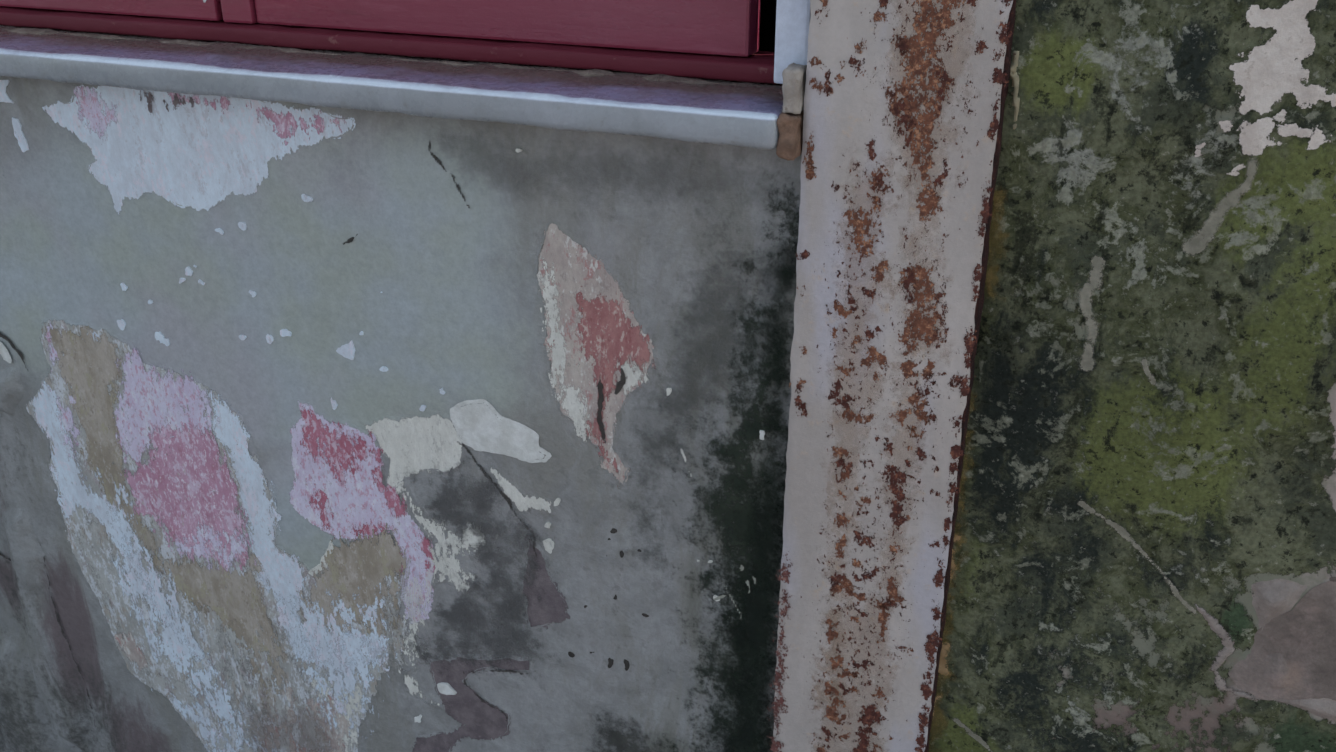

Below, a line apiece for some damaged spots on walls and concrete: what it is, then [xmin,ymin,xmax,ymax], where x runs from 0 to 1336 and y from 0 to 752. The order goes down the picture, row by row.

peeling [39,83,359,218]
water stain [1183,160,1257,255]
spalling [1218,0,1336,176]
crack [0,332,28,370]
peeling [533,216,659,488]
rust [788,0,1016,752]
water stain [1079,255,1105,371]
peeling [24,318,587,752]
water stain [1078,501,1197,614]
rust [767,553,802,752]
flaking render [1228,577,1336,723]
mould [597,714,662,752]